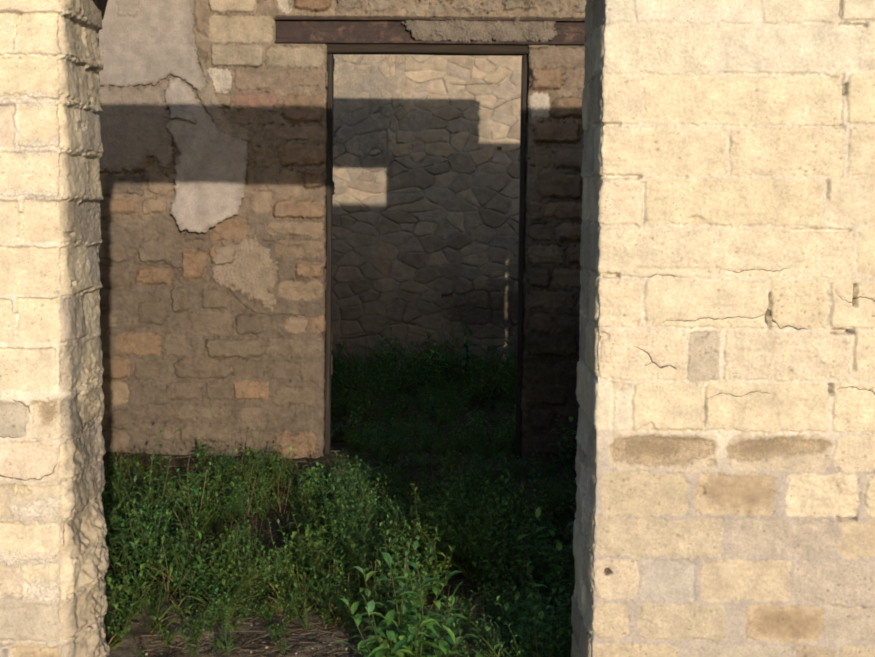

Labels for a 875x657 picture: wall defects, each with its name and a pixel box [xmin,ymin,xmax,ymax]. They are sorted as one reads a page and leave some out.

peeling [98,0,252,233]
crack [634,346,677,370]
crack [0,461,58,481]